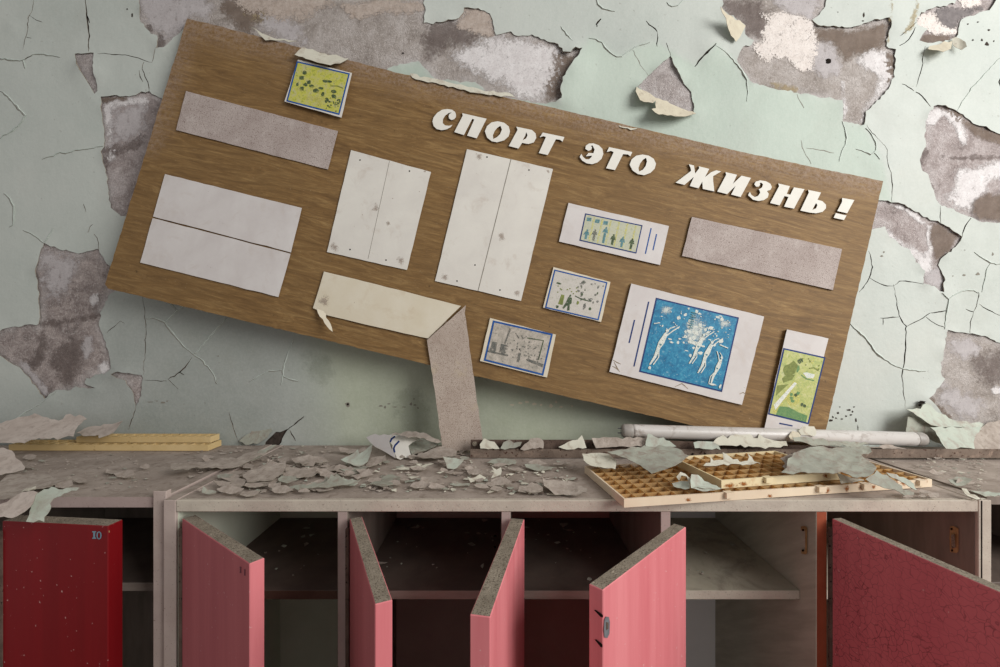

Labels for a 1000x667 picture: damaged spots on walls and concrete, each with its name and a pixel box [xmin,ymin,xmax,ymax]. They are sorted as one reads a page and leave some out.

crack [85,0,154,86]
peeling [126,0,581,104]
peeling [636,57,696,117]
peeling [721,0,895,125]
crack [899,23,929,105]
crack [957,58,1000,111]
peeling [920,105,1000,223]
peeling [872,200,961,292]
peeling [0,243,168,405]
crack [110,303,227,385]
crack [859,218,1000,400]
peeling [906,330,1000,449]